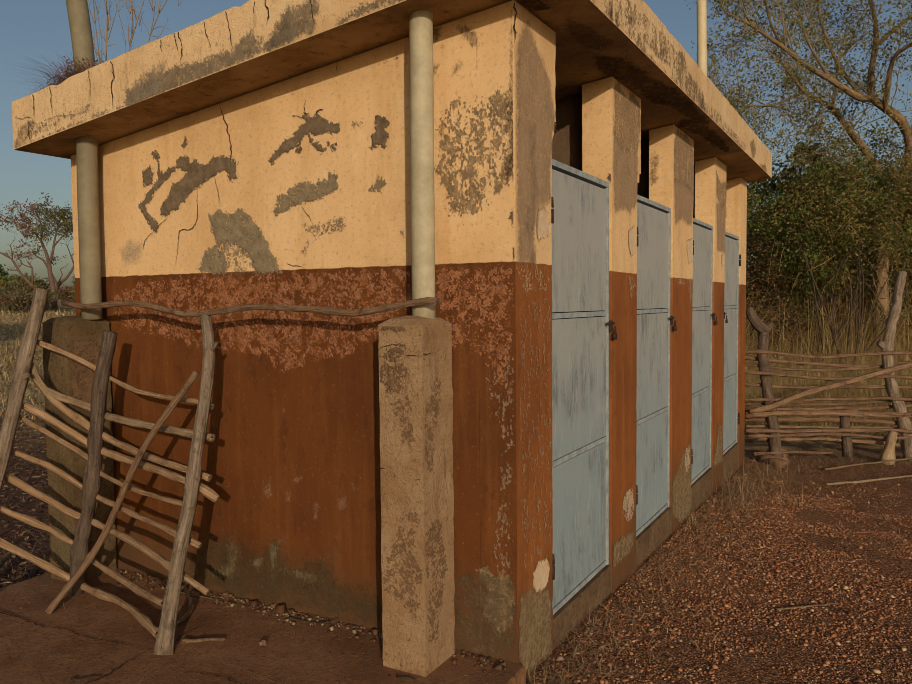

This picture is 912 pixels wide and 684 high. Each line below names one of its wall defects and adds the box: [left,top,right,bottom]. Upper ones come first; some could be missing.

water stain [339,0,401,24]
crack [511,2,519,42]
crack [15,87,78,140]
crack [166,79,232,159]
peeling [268,110,340,166]
peeling [369,115,390,150]
water stain [434,22,555,265]
water stain [609,0,756,156]
crack [143,175,219,260]
peeling [138,136,239,233]
peeling [273,170,339,216]
peeling [114,208,412,371]